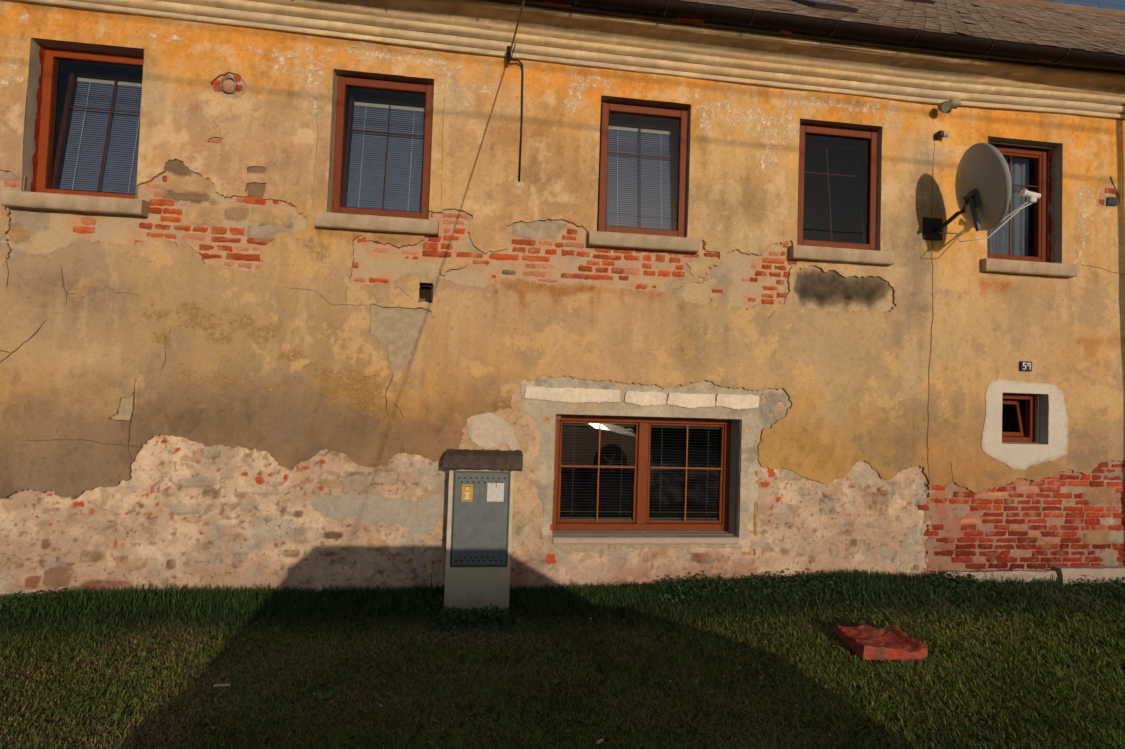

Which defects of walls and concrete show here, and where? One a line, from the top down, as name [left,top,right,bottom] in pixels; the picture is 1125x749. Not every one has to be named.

flaking render [0,45,328,272]
flaking render [350,209,895,313]
damp [797,273,885,301]
crack [0,321,45,363]
flaking render [370,304,432,372]
crack [22,379,143,460]
flaking render [110,368,145,422]
flaking render [0,434,449,599]
flaking render [458,379,1125,589]